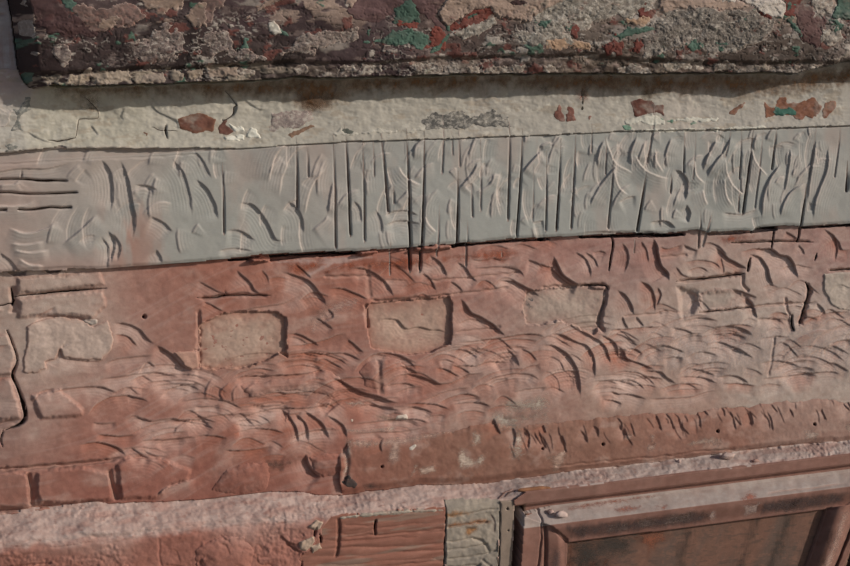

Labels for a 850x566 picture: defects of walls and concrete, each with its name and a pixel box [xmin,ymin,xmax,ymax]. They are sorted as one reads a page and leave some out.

peeling [52,0,267,86]
peeling [268,20,431,56]
peeling [438,0,807,74]
peeling [811,0,844,47]
peeling [340,63,382,76]
peeling [414,62,443,75]
spalling [178,113,261,141]
spalling [624,97,836,133]
crack [676,224,850,282]
crack [0,288,105,306]
crack [790,282,809,330]
crack [0,330,27,447]